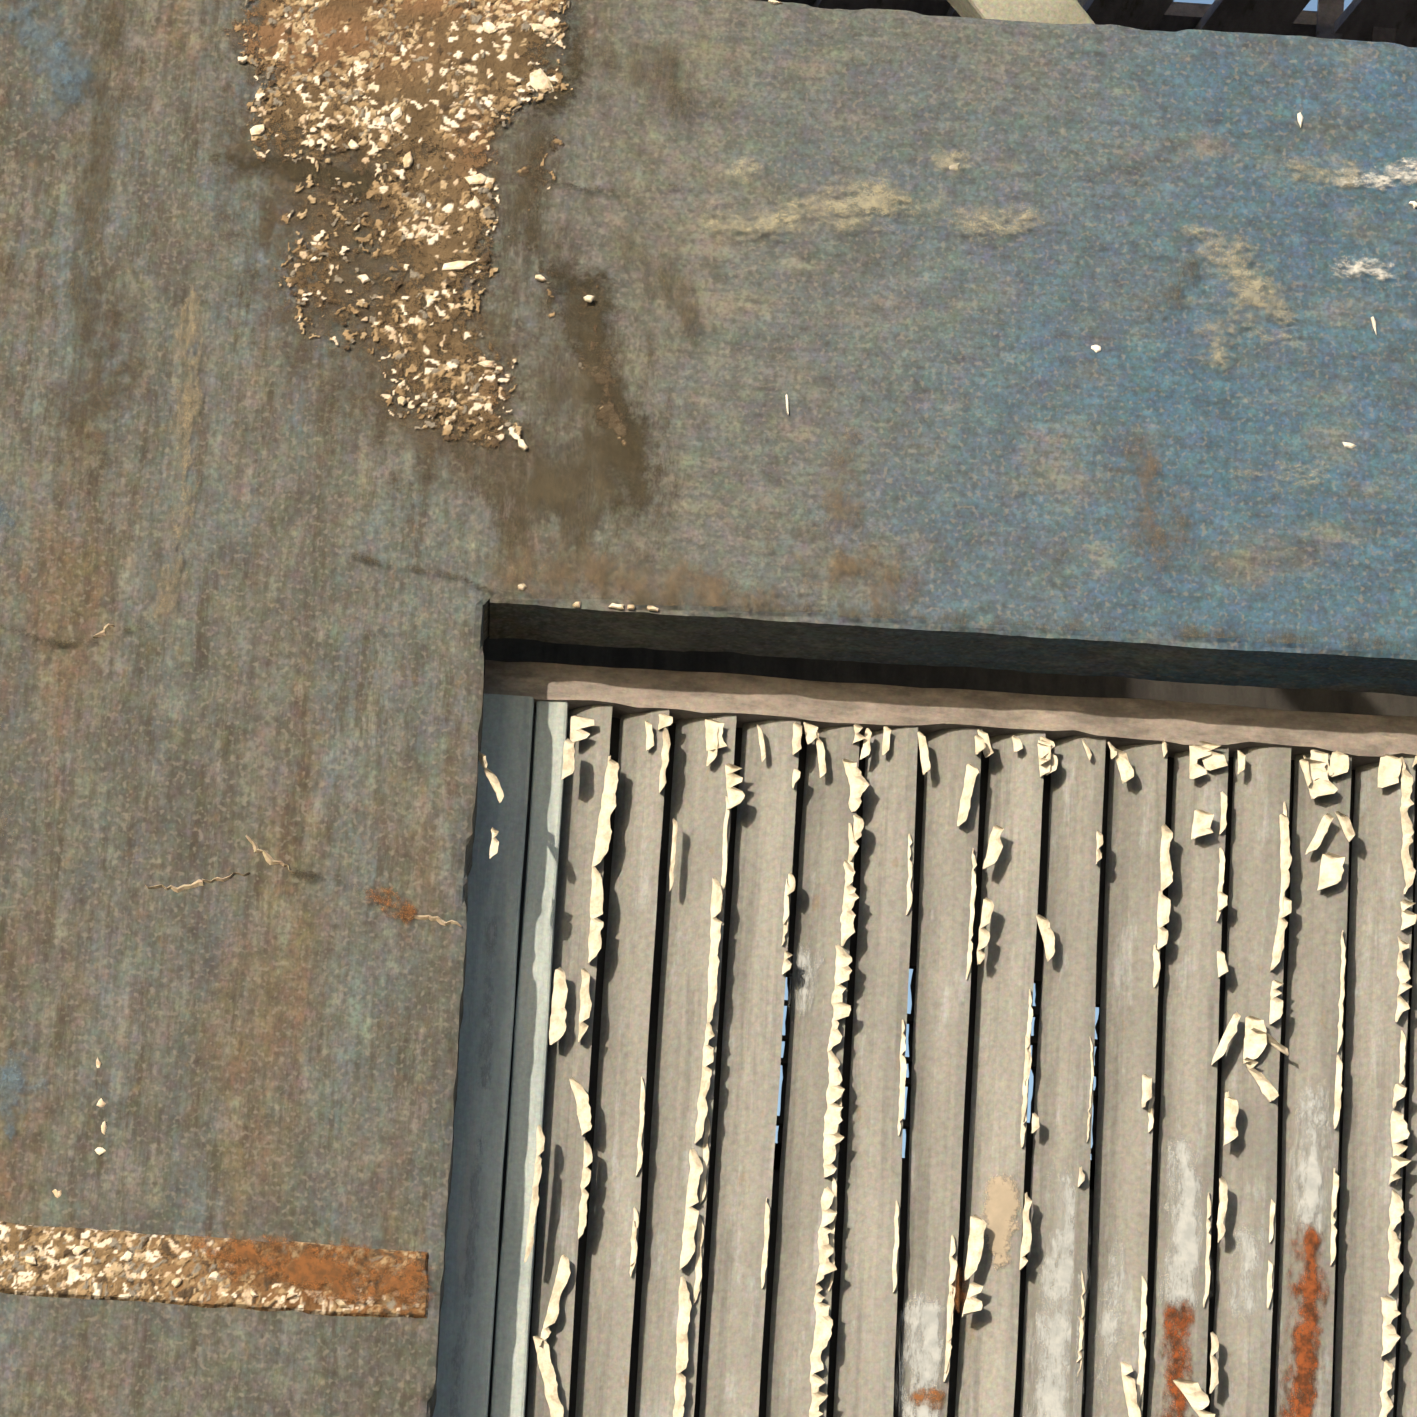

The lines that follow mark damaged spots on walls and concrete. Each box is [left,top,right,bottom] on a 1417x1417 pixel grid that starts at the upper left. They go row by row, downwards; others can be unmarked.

spalling [225,0,573,452]
leakage [706,179,910,232]
leakage [1320,160,1417,187]
leakage [212,86,728,606]
crack [145,835,317,893]
crack [377,897,462,927]
peeling [673,719,745,1417]
peeling [782,722,891,1417]
peeling [1378,754,1417,1417]
corrosion [191,1234,429,1308]
corrosion [1162,1302,1194,1417]
corrosion [1279,1225,1329,1417]